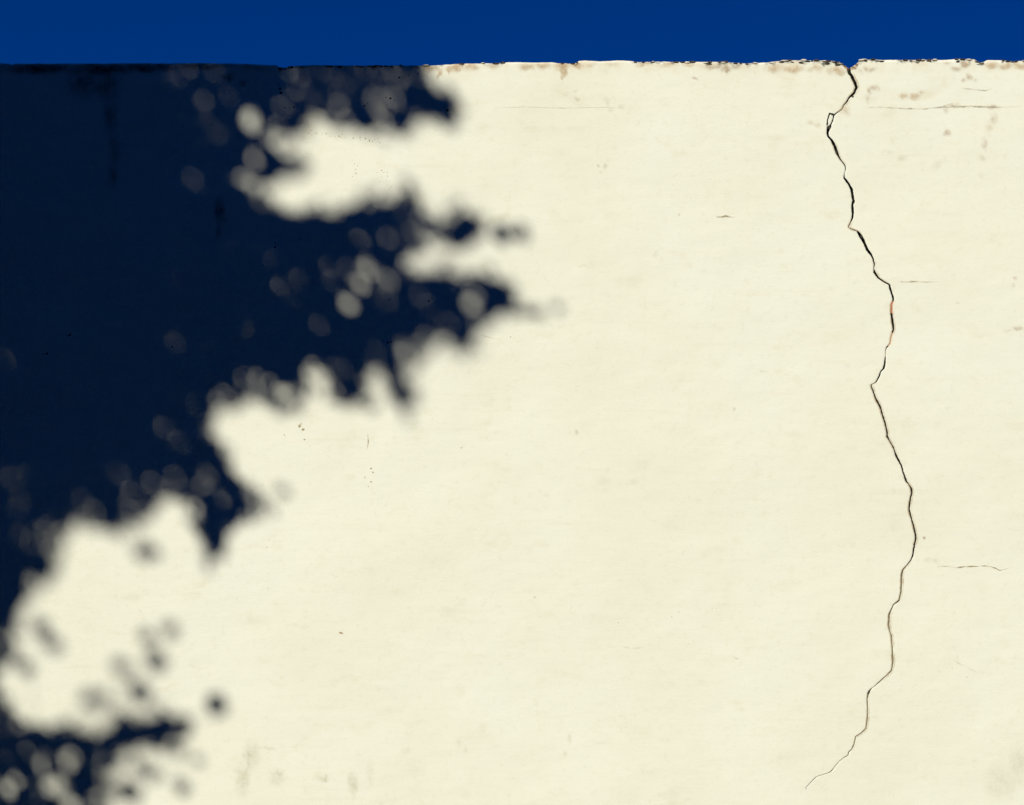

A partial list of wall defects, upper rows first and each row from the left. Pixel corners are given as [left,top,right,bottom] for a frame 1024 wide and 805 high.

crack [805,68,917,788]